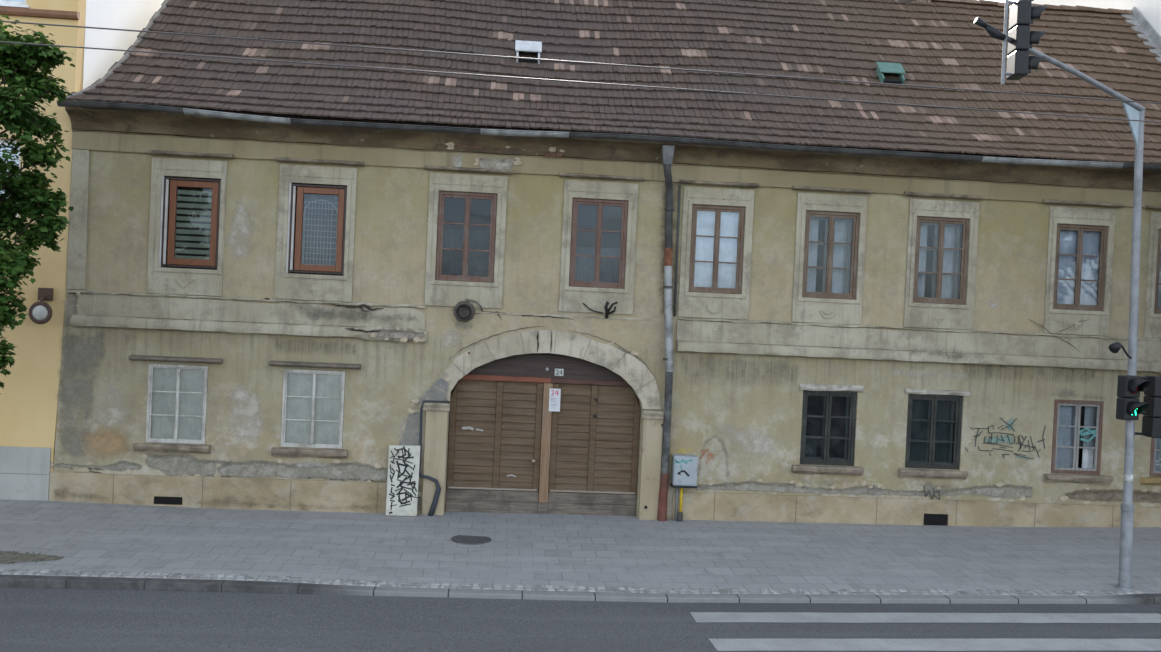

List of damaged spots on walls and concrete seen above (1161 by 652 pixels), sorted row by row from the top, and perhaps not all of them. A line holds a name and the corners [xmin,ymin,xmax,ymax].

flaking render [50,454,387,482]
flaking render [1060,487,1161,505]